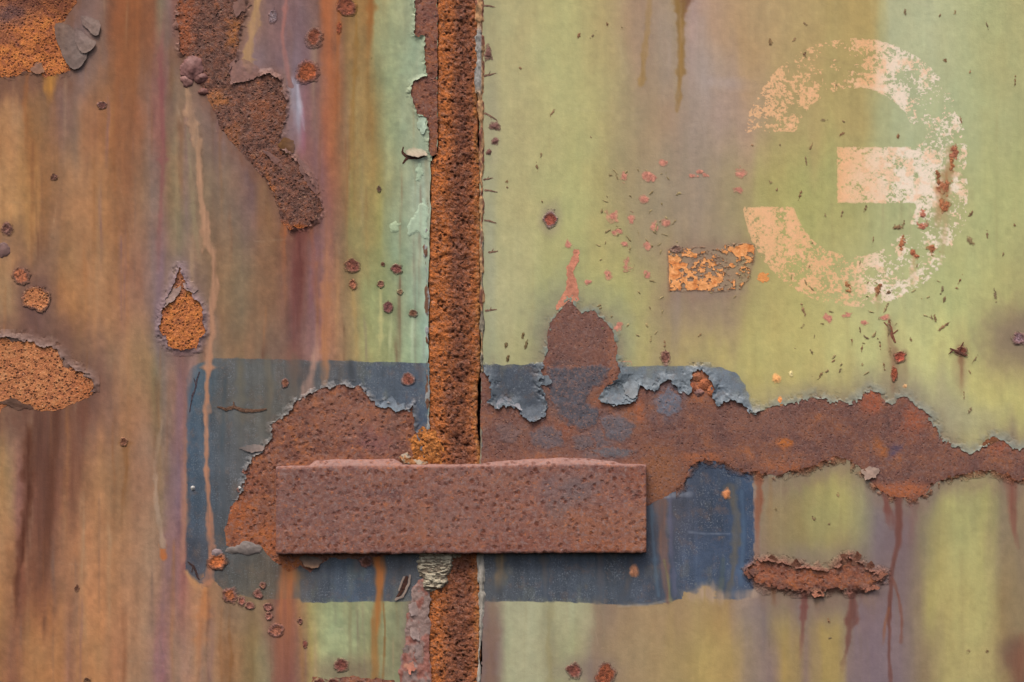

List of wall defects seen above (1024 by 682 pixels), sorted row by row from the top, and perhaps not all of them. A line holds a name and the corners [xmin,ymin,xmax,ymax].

spalling [294,26,324,85]
corrosion [932,140,967,271]
spalling [11,266,51,313]
peeling [666,242,769,293]
corrosion [172,0,444,682]
spalling [659,350,672,367]
spalling [890,350,907,388]
corrosion [480,290,1024,682]
peeling [398,579,432,682]